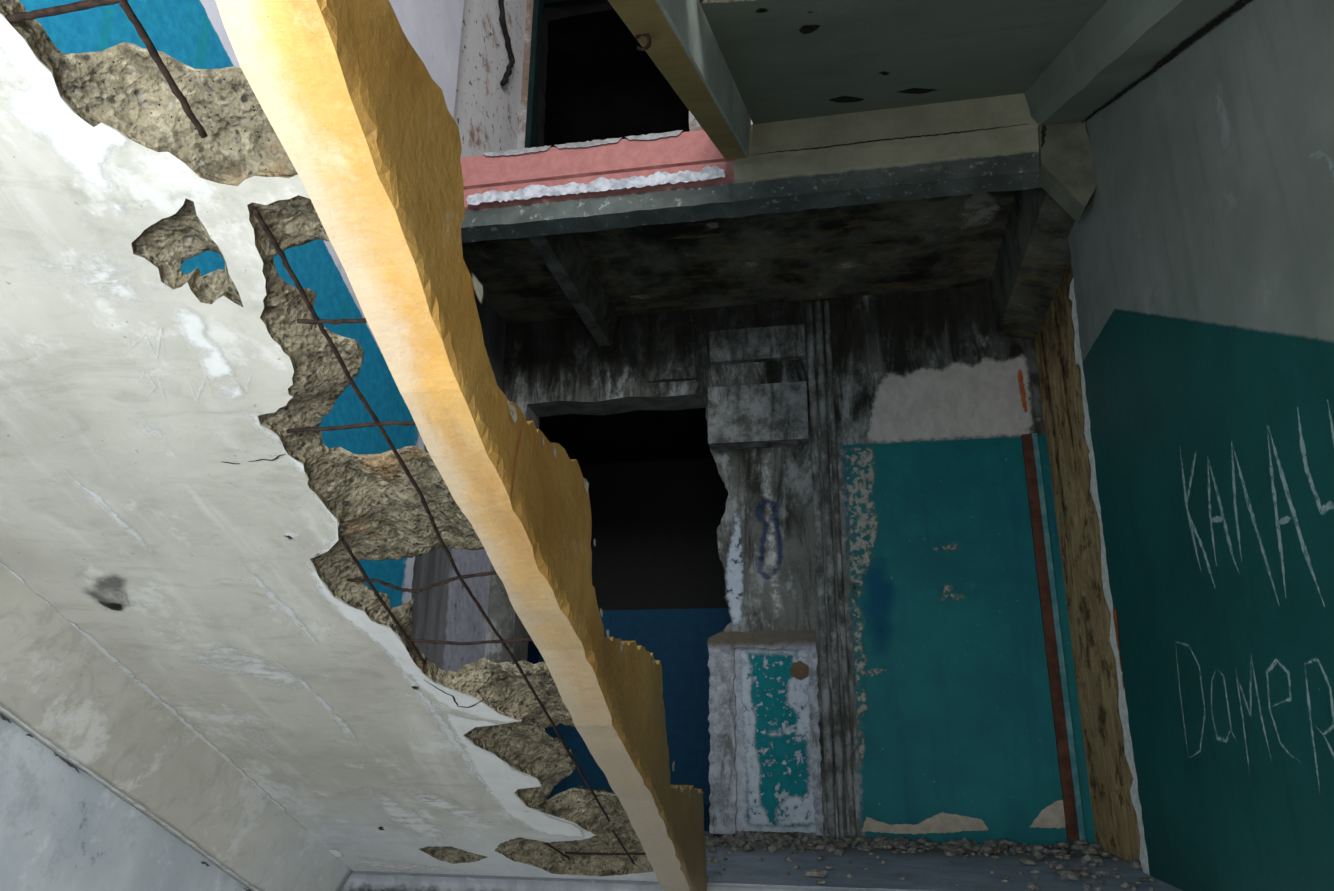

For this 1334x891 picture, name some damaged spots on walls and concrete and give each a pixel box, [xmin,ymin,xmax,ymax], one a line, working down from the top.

spalling [799,12,820,34]
spalling [0,0,297,189]
peeling [483,130,683,156]
peeling [466,166,725,205]
peeling [48,260,134,300]
spalling [135,199,241,301]
peeling [177,308,243,398]
spalling [249,195,652,873]
peeling [846,356,1033,763]
peeling [734,648,816,833]
peeling [862,812,988,835]
peeling [1030,800,1066,829]